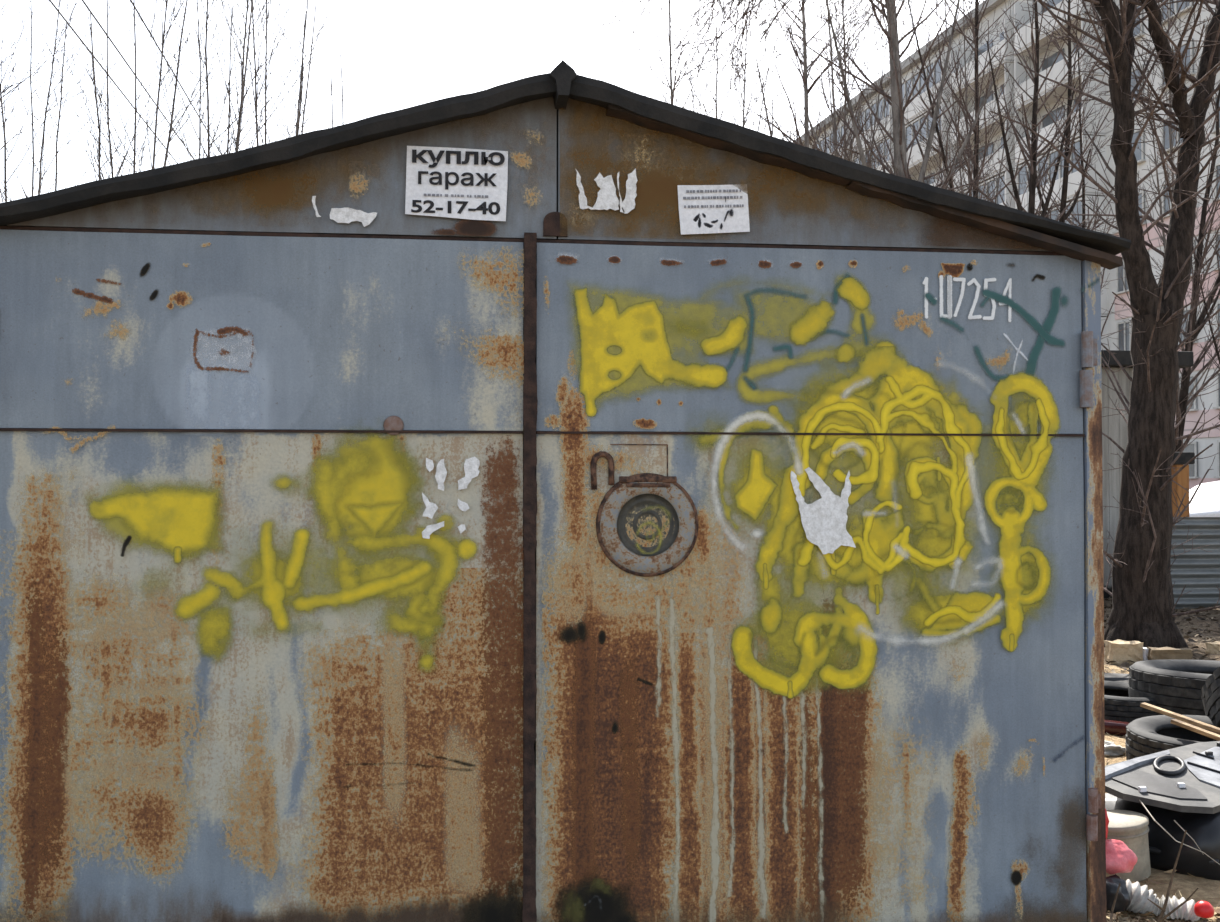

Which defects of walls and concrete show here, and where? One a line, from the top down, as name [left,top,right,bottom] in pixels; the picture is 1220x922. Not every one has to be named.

corrosion [433,219,496,236]
corrosion [446,330,524,387]
corrosion [461,246,524,317]
corrosion [0,470,210,922]
damp [213,882,523,922]
corrosion [222,434,524,917]
damp [560,622,606,644]
damp [555,877,646,922]
damp [655,596,687,922]
corrosion [541,350,937,922]
damp [702,627,848,922]
corrosion [946,734,990,922]